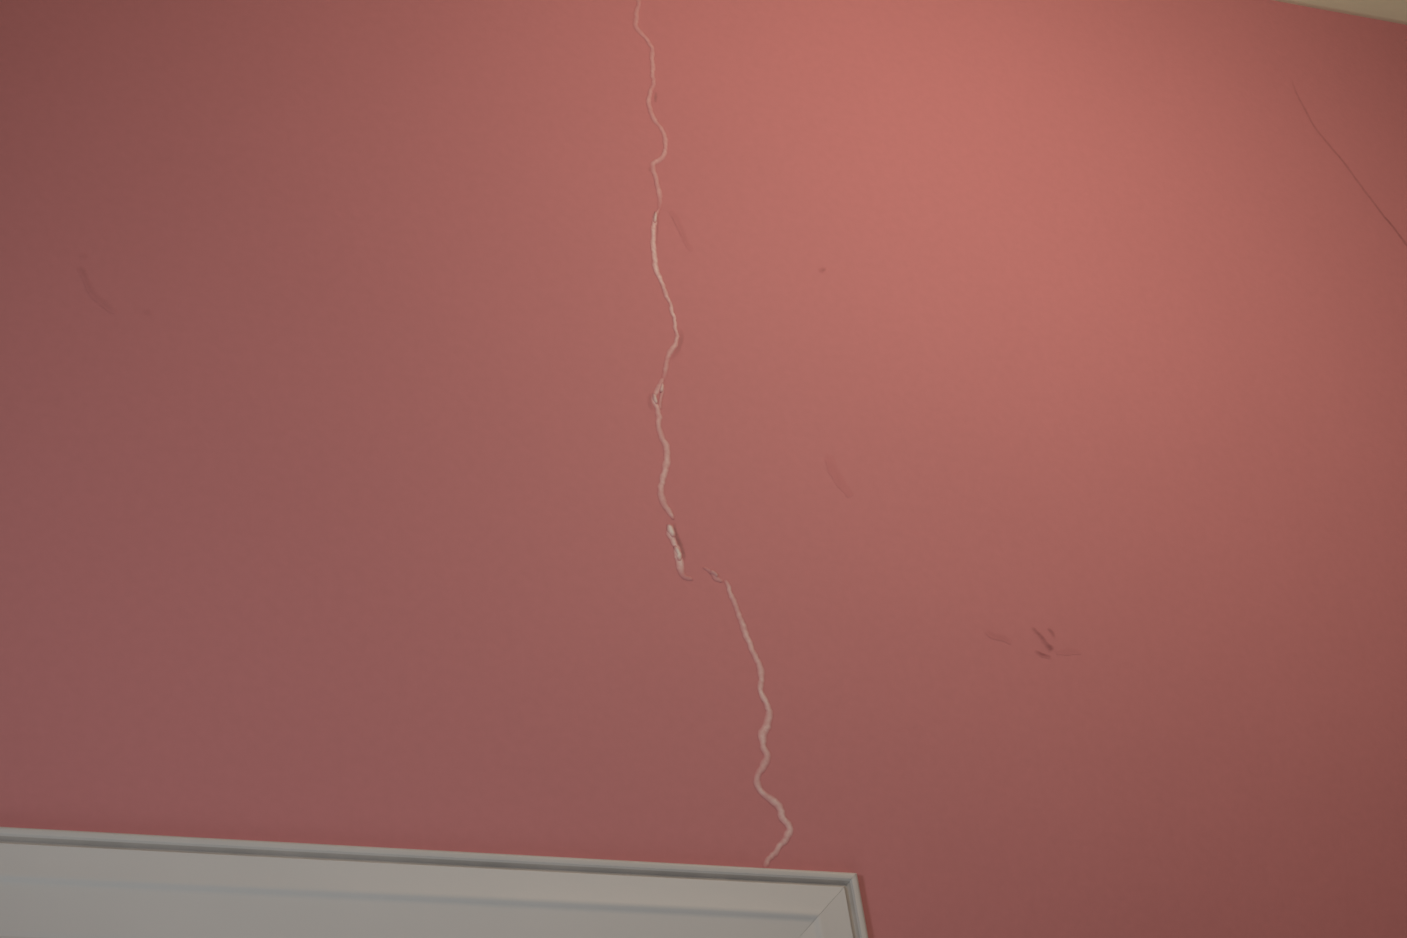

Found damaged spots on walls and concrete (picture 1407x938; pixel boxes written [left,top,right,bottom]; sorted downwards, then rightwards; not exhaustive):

crack [633,0,794,868]